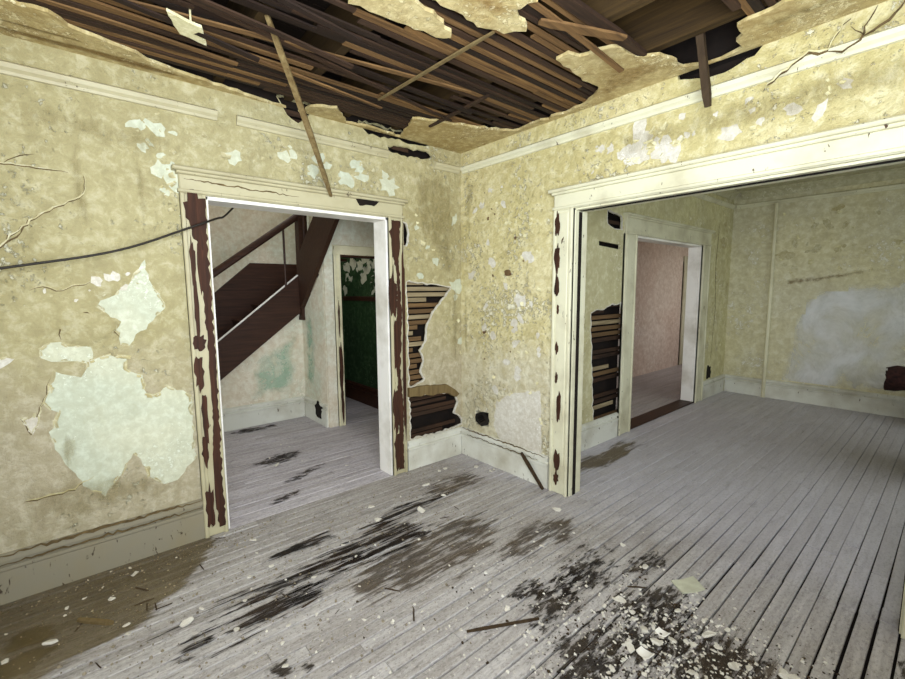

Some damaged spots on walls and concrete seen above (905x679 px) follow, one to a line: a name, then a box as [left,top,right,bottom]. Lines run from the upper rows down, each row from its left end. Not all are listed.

flaking render [16,0,624,161]
crack [763,0,905,91]
crack [0,154,86,248]
flaking render [0,356,15,369]
crack [21,378,51,435]
crack [31,280,94,291]
peeling [38,113,226,528]
peeling [389,214,476,471]
peeling [482,208,543,454]
peeling [793,289,905,387]
crack [26,476,94,502]
crack [1,500,202,566]